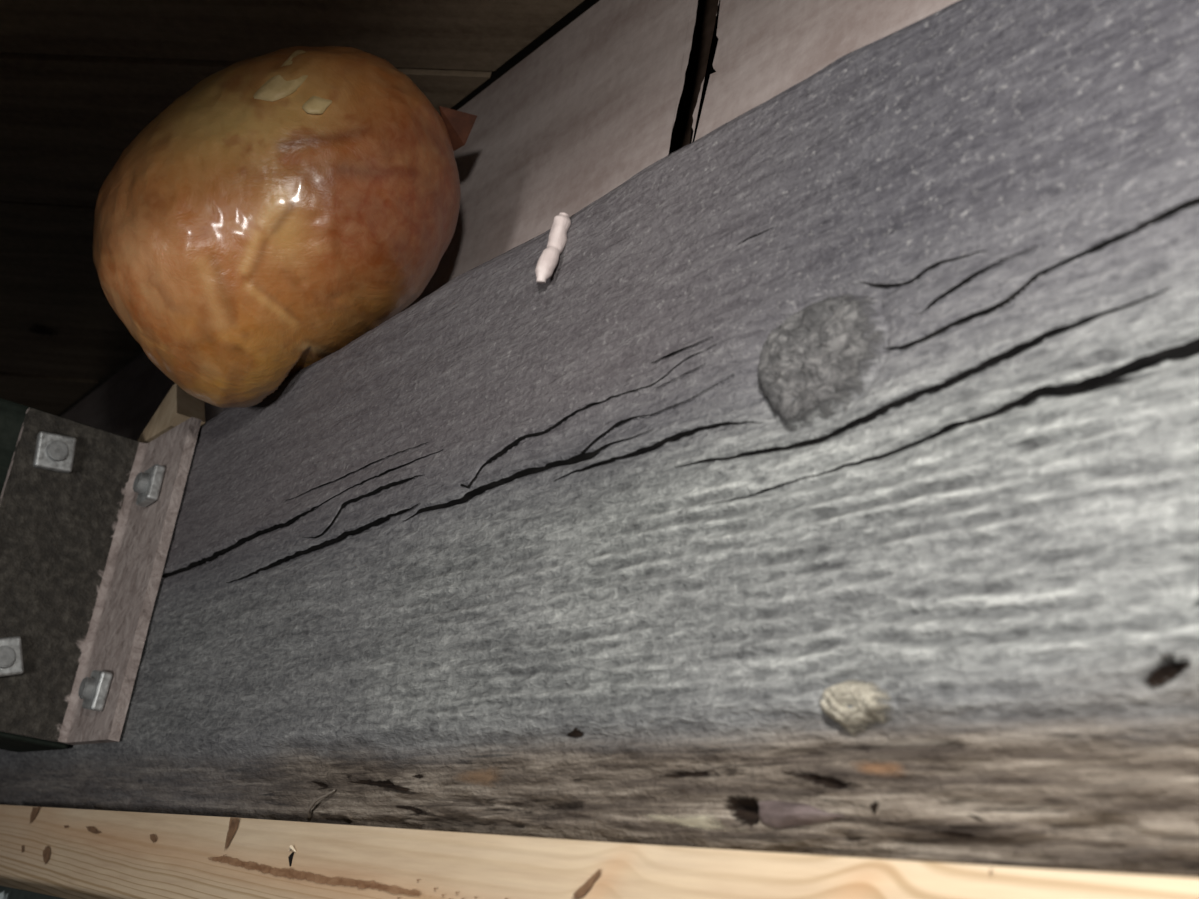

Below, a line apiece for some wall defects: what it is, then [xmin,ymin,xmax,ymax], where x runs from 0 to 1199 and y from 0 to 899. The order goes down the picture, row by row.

crack [860,197,1199,349]
crack [162,287,1199,583]